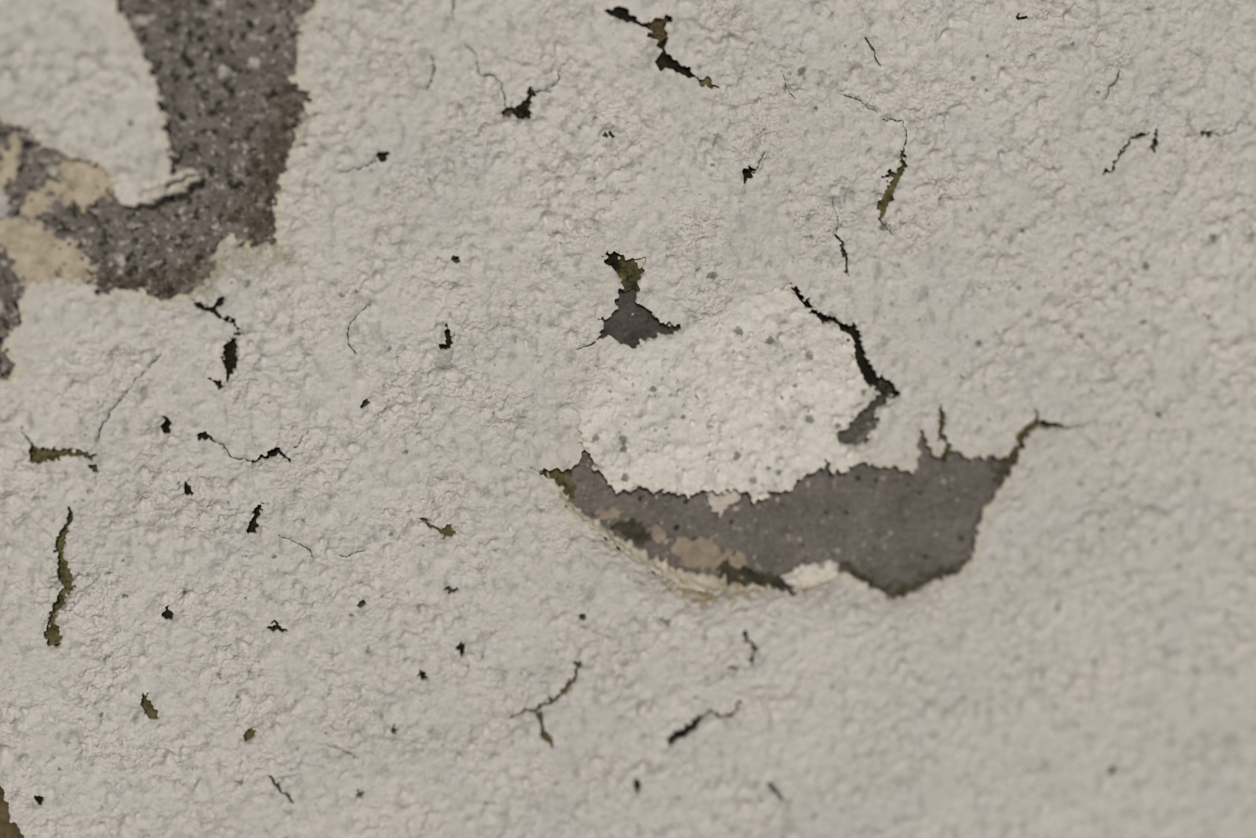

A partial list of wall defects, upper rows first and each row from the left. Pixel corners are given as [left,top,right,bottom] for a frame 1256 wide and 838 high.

crack [451,0,565,120]
peeling [0,0,317,380]
crack [841,94,907,235]
crack [21,353,162,486]
crack [194,296,255,389]
crack [209,430,309,463]
peeling [540,251,1033,599]
crack [790,283,899,444]
crack [44,506,76,645]
crack [510,661,581,747]
crack [667,700,741,744]
peeling [0,786,24,838]